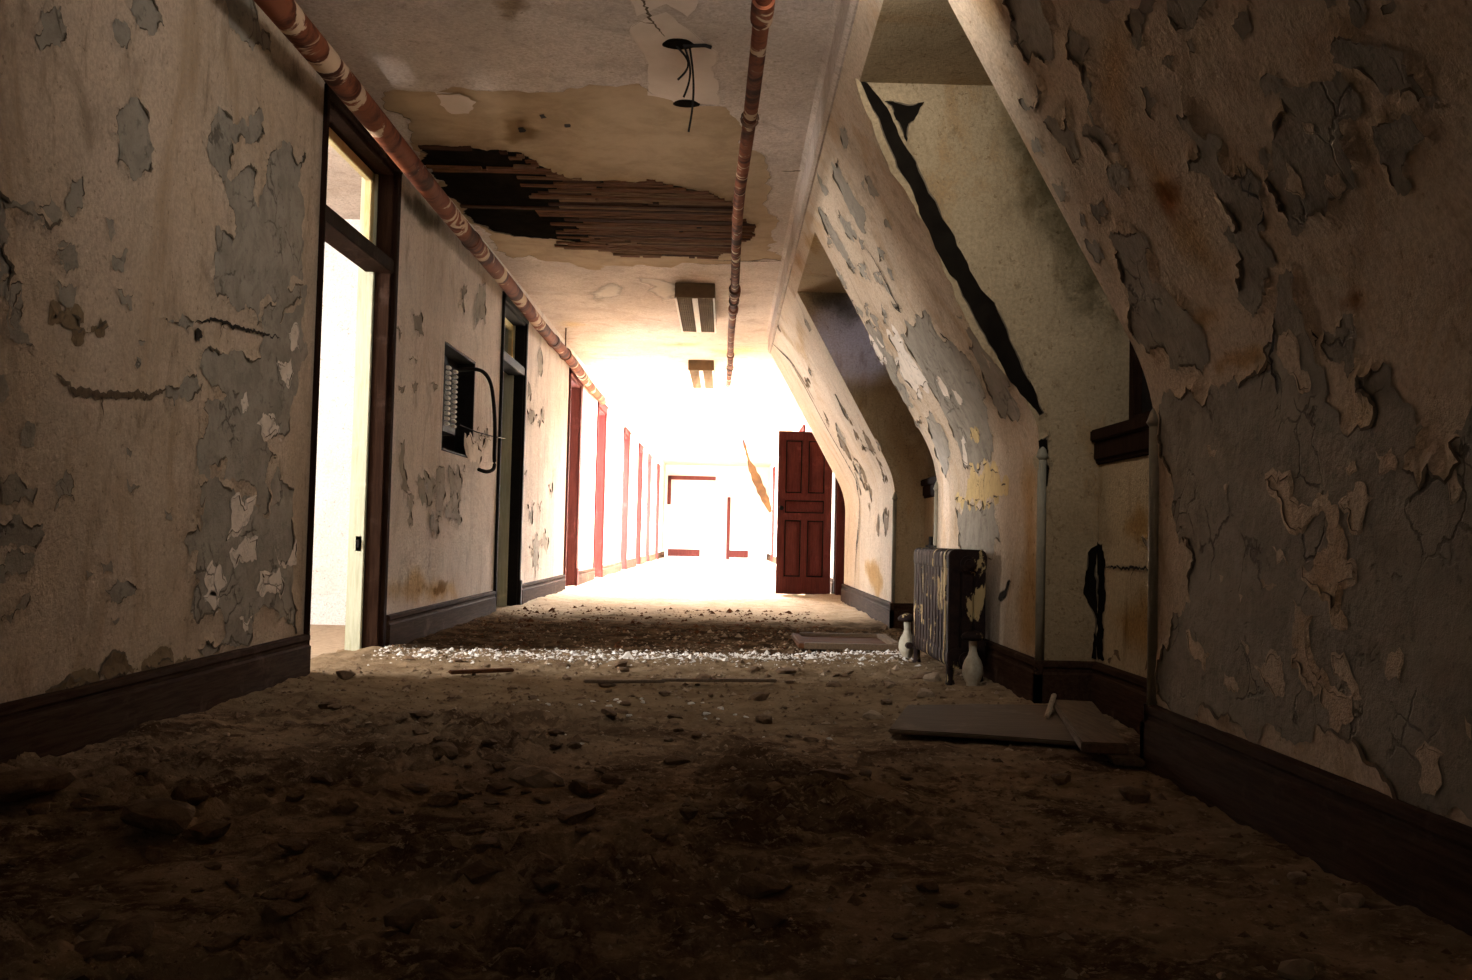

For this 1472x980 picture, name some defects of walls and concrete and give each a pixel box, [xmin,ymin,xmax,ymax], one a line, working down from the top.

peeling [0,173,109,354]
spalling [378,82,782,270]
flaking render [816,78,1054,570]
peeling [1001,0,1472,820]
peeling [0,467,76,624]